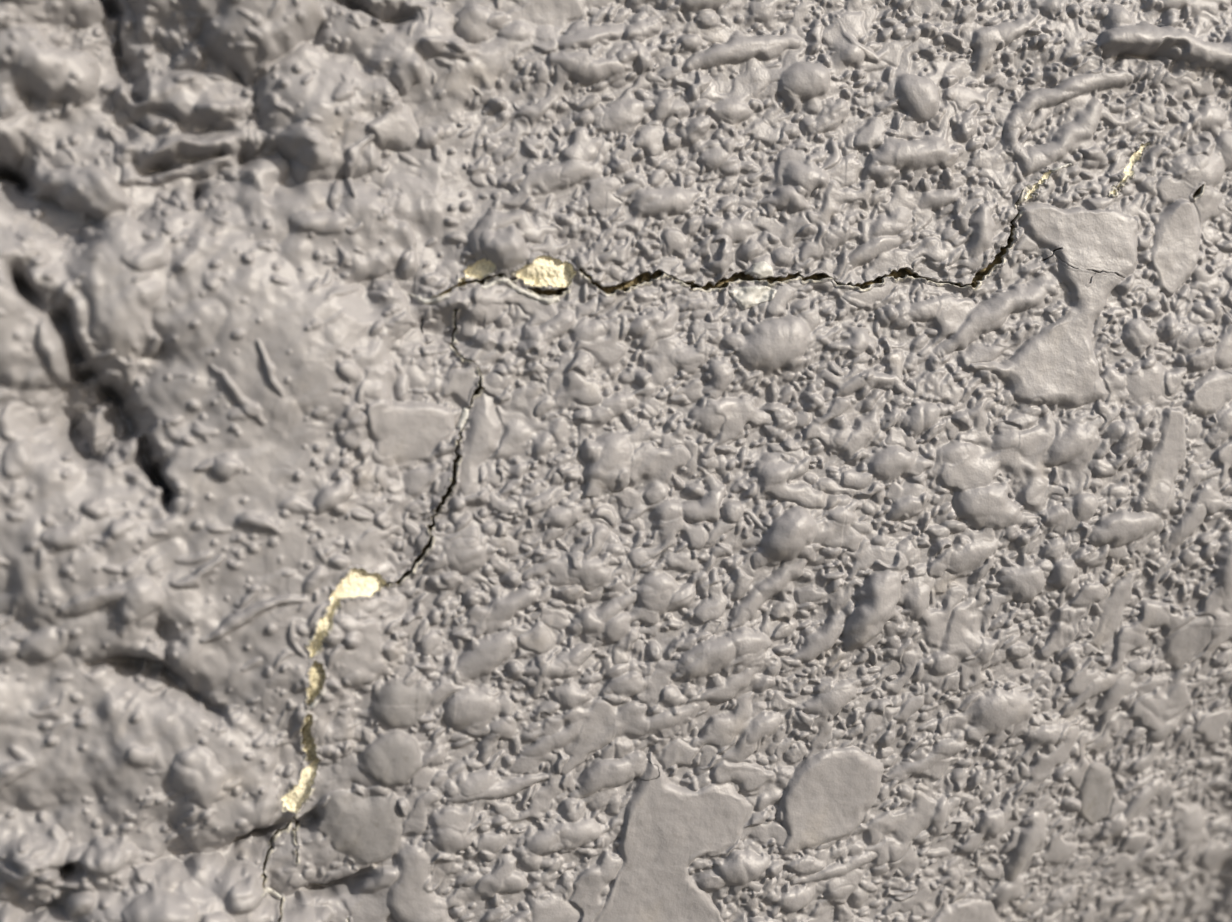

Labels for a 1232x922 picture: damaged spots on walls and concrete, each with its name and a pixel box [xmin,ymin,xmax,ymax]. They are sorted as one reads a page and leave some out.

crack [576,187,1127,310]
crack [385,304,486,590]
crack [259,815,302,922]